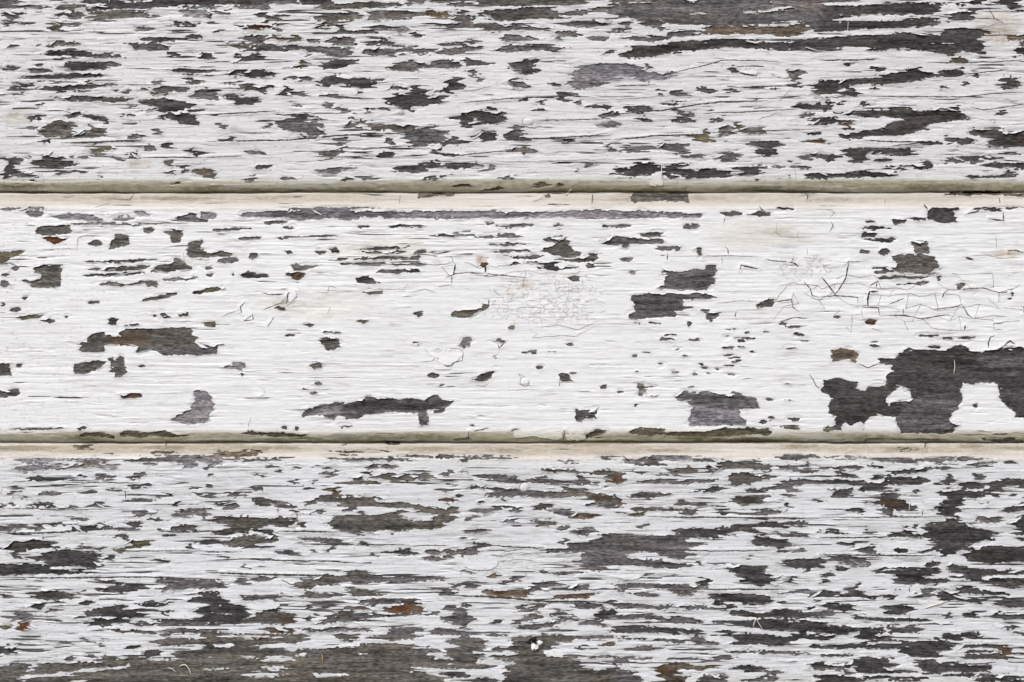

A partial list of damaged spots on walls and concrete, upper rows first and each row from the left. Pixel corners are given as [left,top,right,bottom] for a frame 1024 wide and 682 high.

peeling [0,0,1024,357]
crack [721,197,1023,351]
peeling [74,312,224,377]
peeling [241,337,496,439]
peeling [558,372,624,393]
peeling [628,322,808,438]
peeling [821,334,1024,442]
peeling [0,390,1024,682]